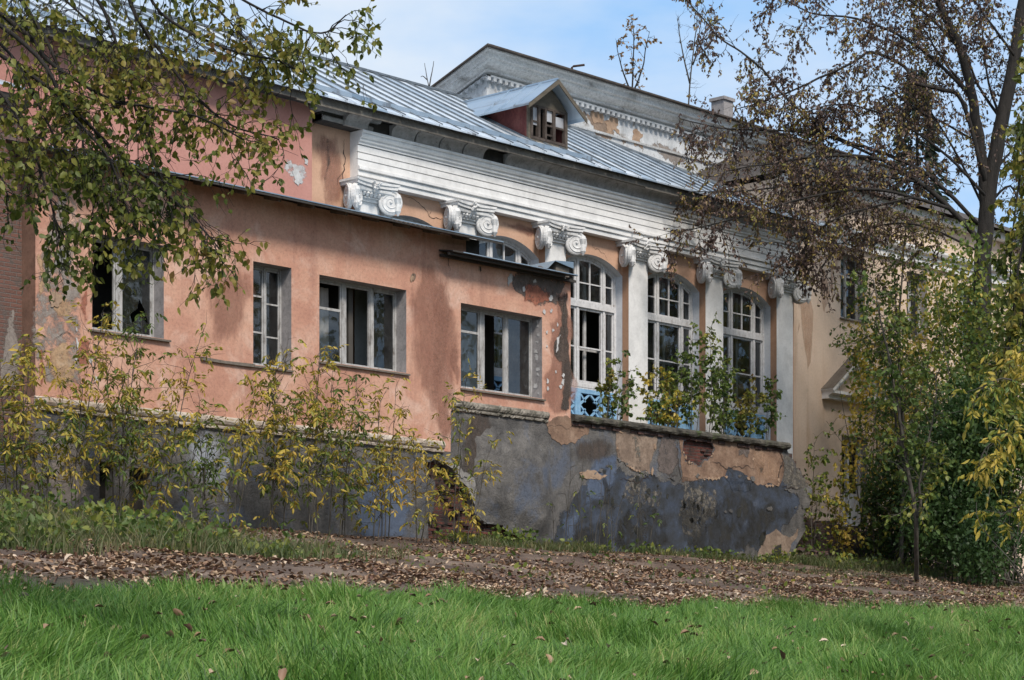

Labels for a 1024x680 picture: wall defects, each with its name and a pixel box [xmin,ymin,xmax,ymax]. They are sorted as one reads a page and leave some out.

peeling [285,158,308,186]
peeling [583,110,686,167]
flaking render [32,188,98,385]
flaking render [0,310,20,390]
flaking render [507,266,565,394]
leakage [544,294,577,412]
flaking render [546,416,590,445]
flaking render [580,428,669,513]
flaking render [679,438,787,536]
flaking render [758,529,798,560]